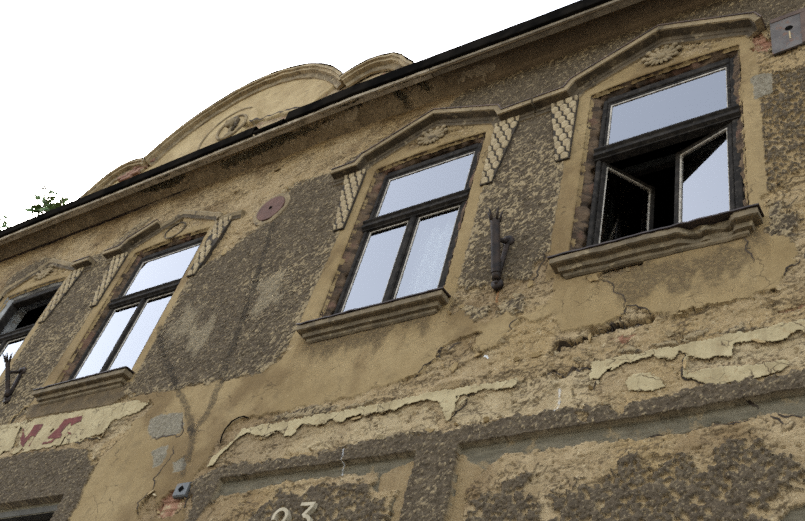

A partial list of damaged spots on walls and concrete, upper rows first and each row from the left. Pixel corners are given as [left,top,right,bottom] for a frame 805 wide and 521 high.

flaking render [206,278,805,467]
crack [541,280,653,389]
peeling [0,399,153,463]
crack [136,419,184,515]
flaking render [137,489,185,521]